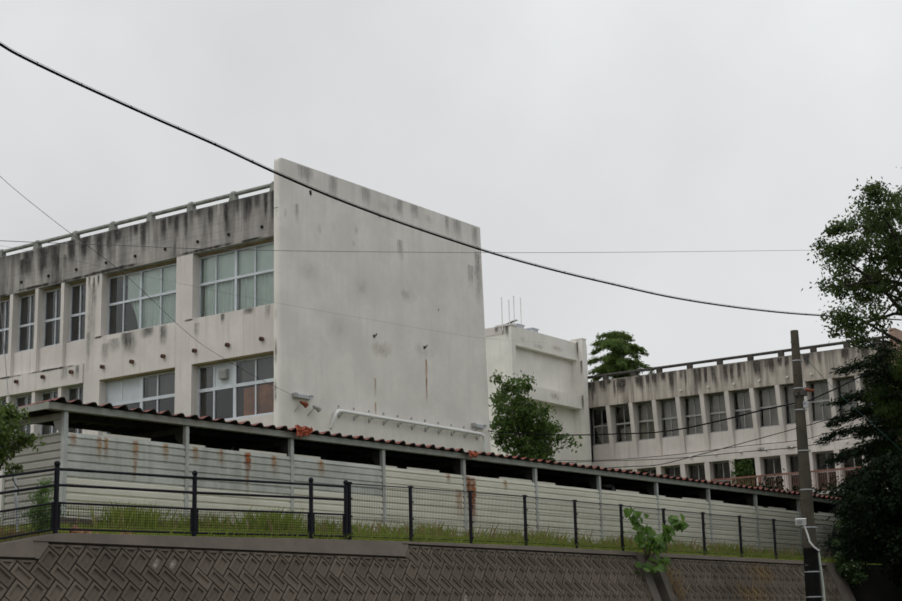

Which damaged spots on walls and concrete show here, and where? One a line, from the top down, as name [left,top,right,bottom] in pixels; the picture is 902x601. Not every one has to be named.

leakage [161,207,212,233]
leakage [224,192,274,224]
leakage [21,229,121,273]
leakage [64,264,134,283]
leakage [582,356,788,405]
corrosion [457,477,476,515]